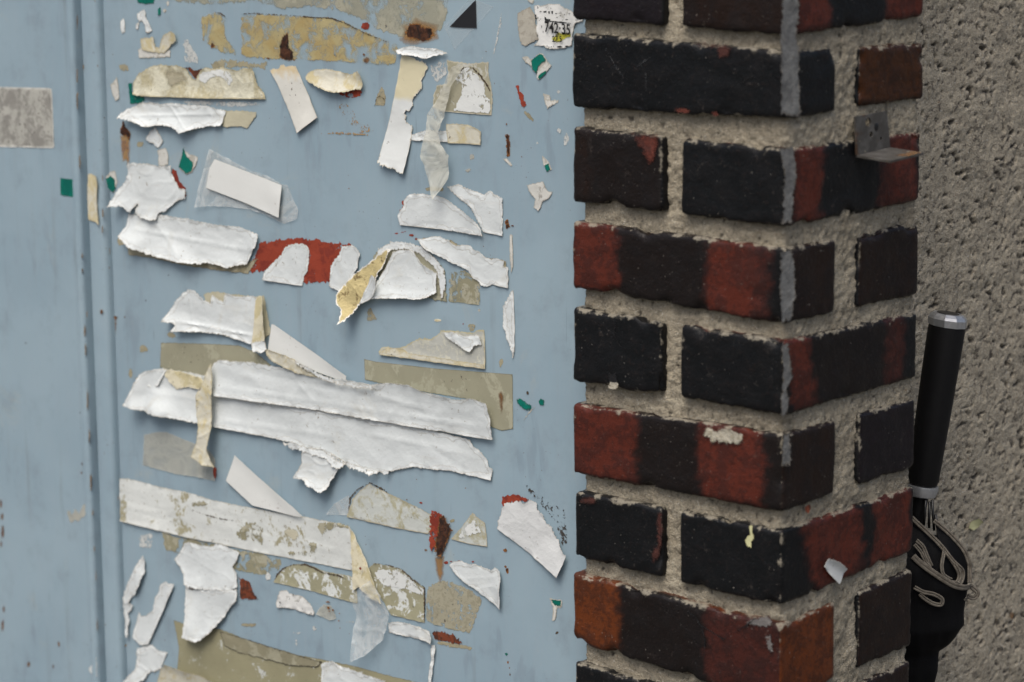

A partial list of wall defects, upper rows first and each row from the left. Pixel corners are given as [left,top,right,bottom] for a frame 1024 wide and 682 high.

rust [404,22,436,42]
rust [267,33,295,60]
peeling [502,494,529,506]
rust [406,499,454,578]